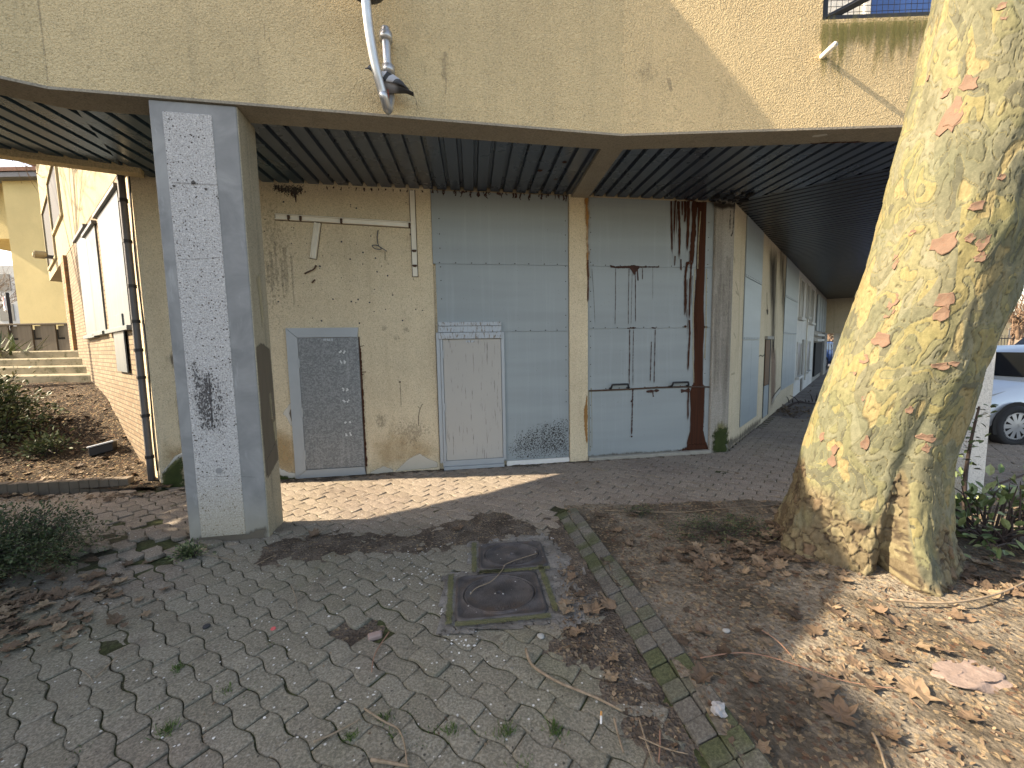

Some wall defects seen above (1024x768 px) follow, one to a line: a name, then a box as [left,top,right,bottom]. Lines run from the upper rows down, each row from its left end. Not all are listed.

rust [610,265,659,437]
rust [670,198,708,451]